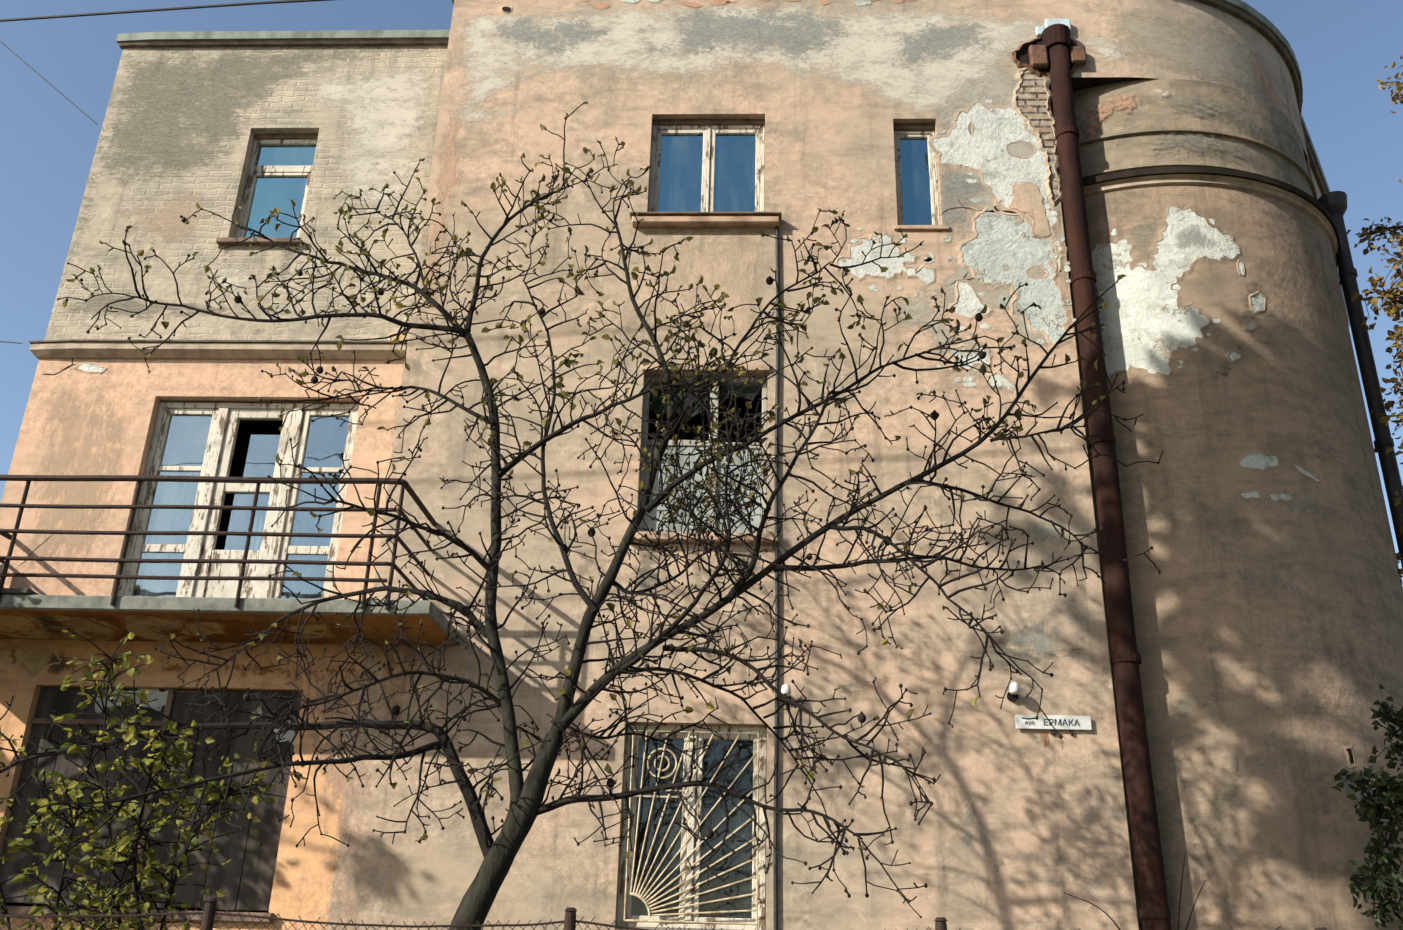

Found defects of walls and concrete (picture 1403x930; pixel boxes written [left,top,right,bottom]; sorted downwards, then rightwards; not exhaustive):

leakage [91,4,1037,305]
flaking render [834,39,1076,399]
leakage [897,258,1047,375]
flaking render [1091,202,1245,382]
flaking render [1242,291,1268,333]
flaking render [1237,449,1322,484]